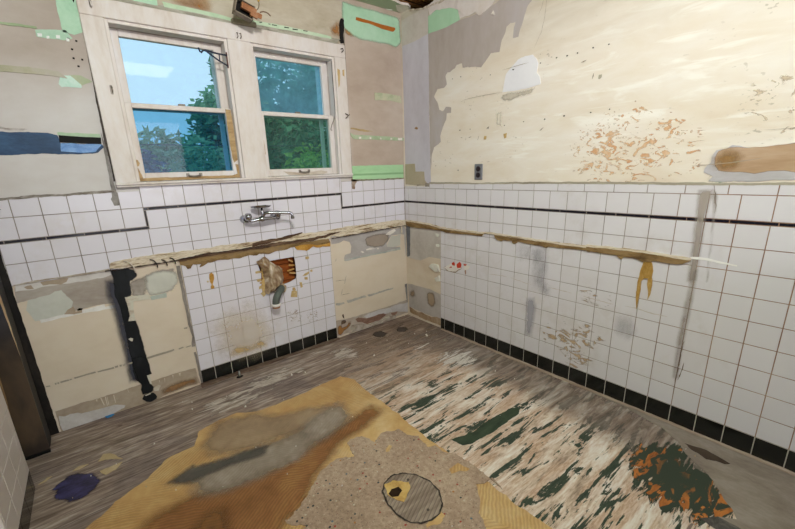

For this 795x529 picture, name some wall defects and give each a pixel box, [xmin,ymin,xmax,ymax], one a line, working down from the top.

peeling [409,0,495,19]
peeling [35,29,72,42]
peeling [59,75,82,88]
peeling [574,106,702,182]
flaking render [15,271,111,292]
peeling [125,294,150,321]
peeling [336,284,441,336]
flaking render [55,368,200,432]